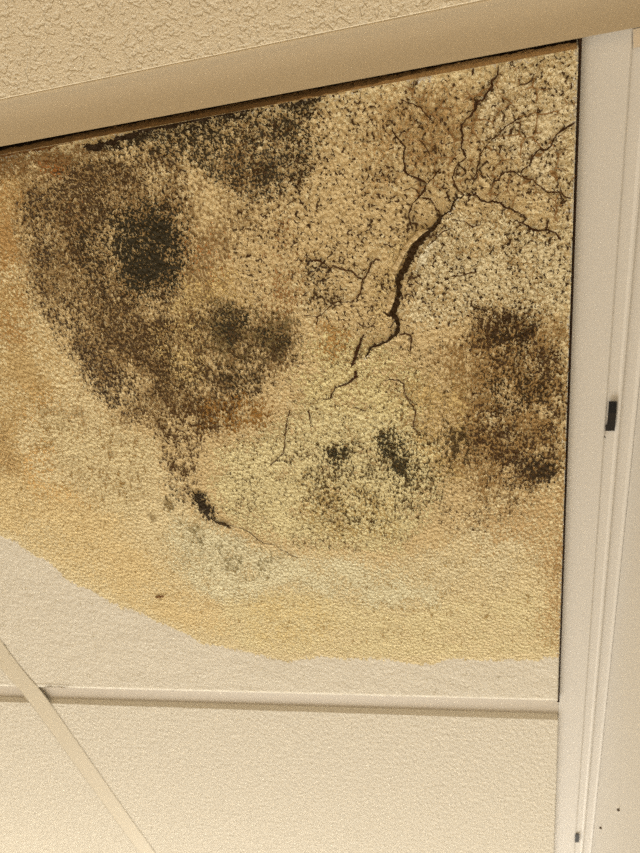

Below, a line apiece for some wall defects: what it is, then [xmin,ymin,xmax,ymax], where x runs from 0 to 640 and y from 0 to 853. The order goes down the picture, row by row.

crack [229,525,301,558]
damp [0,39,579,692]
crack [270,64,577,466]